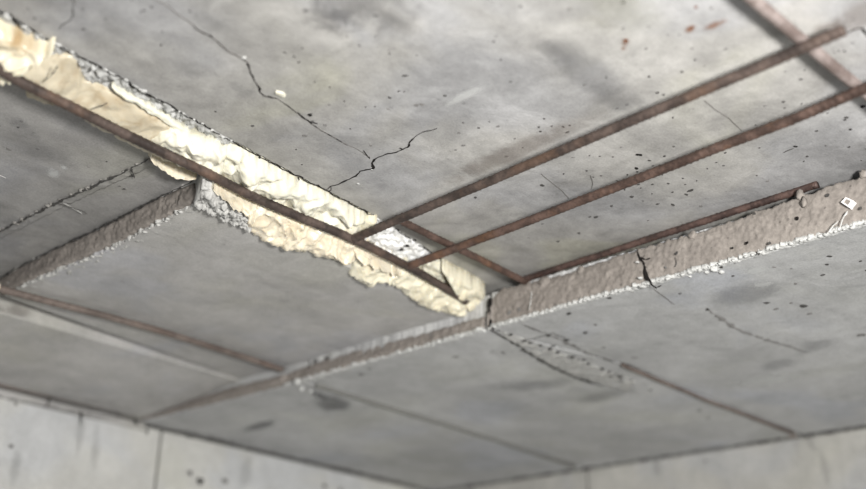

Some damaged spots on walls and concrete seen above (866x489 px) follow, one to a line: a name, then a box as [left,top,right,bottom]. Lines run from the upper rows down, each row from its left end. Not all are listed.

crack [0,0,442,278]
spalling [283,197,866,435]